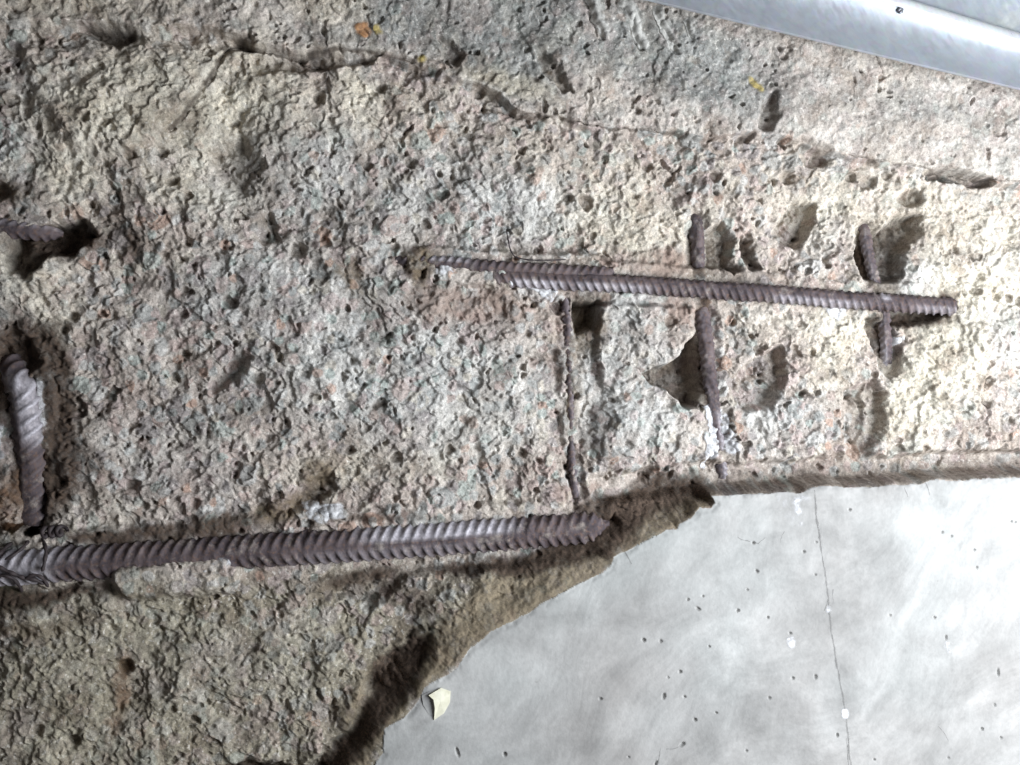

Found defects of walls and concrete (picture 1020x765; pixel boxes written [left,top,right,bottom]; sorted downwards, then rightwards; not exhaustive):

crack [169,41,409,131]
spalling [0,0,1020,548]
rust [854,246,875,281]
rust [890,313,947,328]
rust [0,321,82,519]
rust [257,496,310,521]
rust [69,513,247,544]
rust [0,584,94,611]
spalling [0,409,612,765]